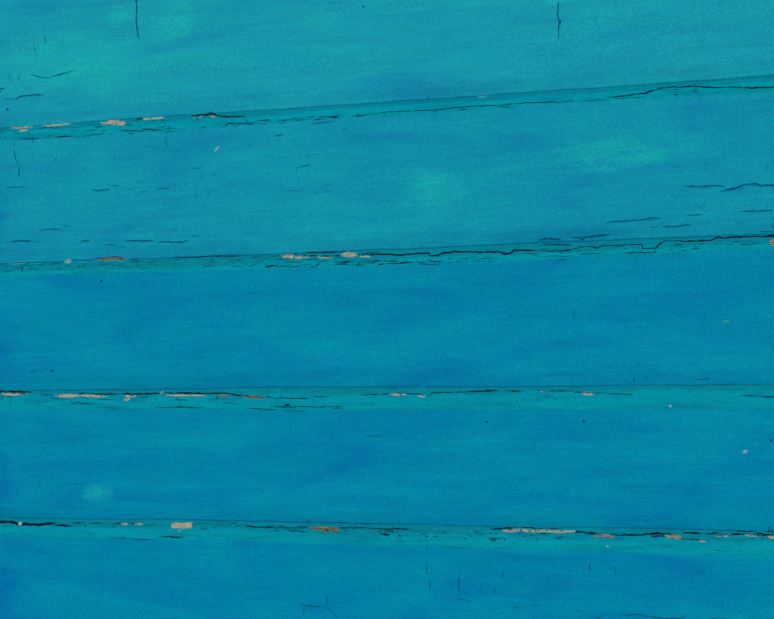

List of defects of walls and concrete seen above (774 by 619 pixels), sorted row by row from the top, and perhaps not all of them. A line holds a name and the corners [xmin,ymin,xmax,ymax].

crack [133,0,141,41]
crack [608,84,774,99]
peeling [10,116,164,133]
crack [202,100,571,137]
crack [684,182,774,192]
crack [9,209,774,269]
peeling [271,251,395,260]
crack [6,263,86,273]
peeling [0,390,309,402]
peeling [170,521,193,531]
peeling [501,528,576,539]